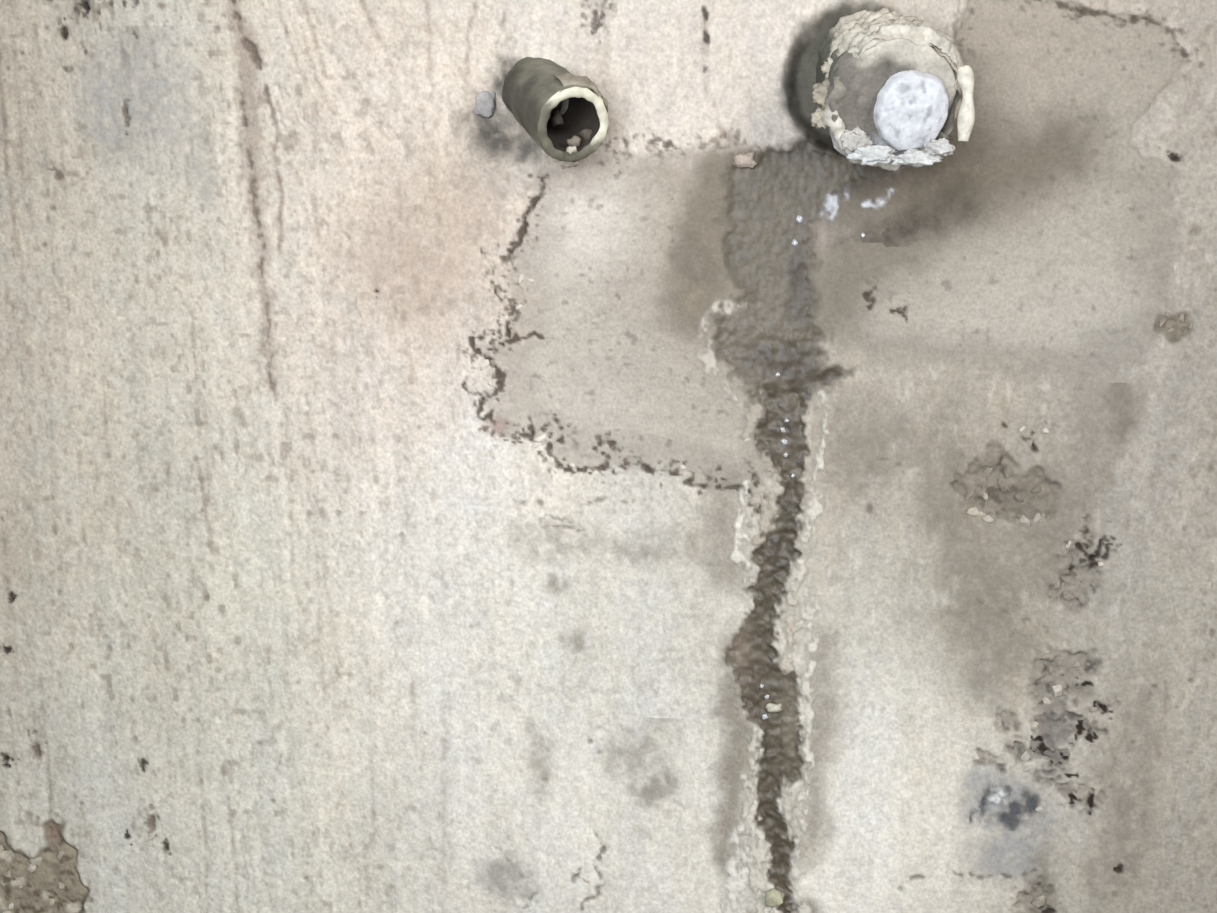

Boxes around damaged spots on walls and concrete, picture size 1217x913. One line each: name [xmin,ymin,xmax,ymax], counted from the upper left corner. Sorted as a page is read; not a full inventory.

crack [462,175,766,514]
damp [673,6,1074,913]
spalling [954,455,1058,528]
spalling [1048,561,1100,606]
spalling [976,651,1113,815]
spalling [0,820,89,913]
spalling [1016,877,1054,913]